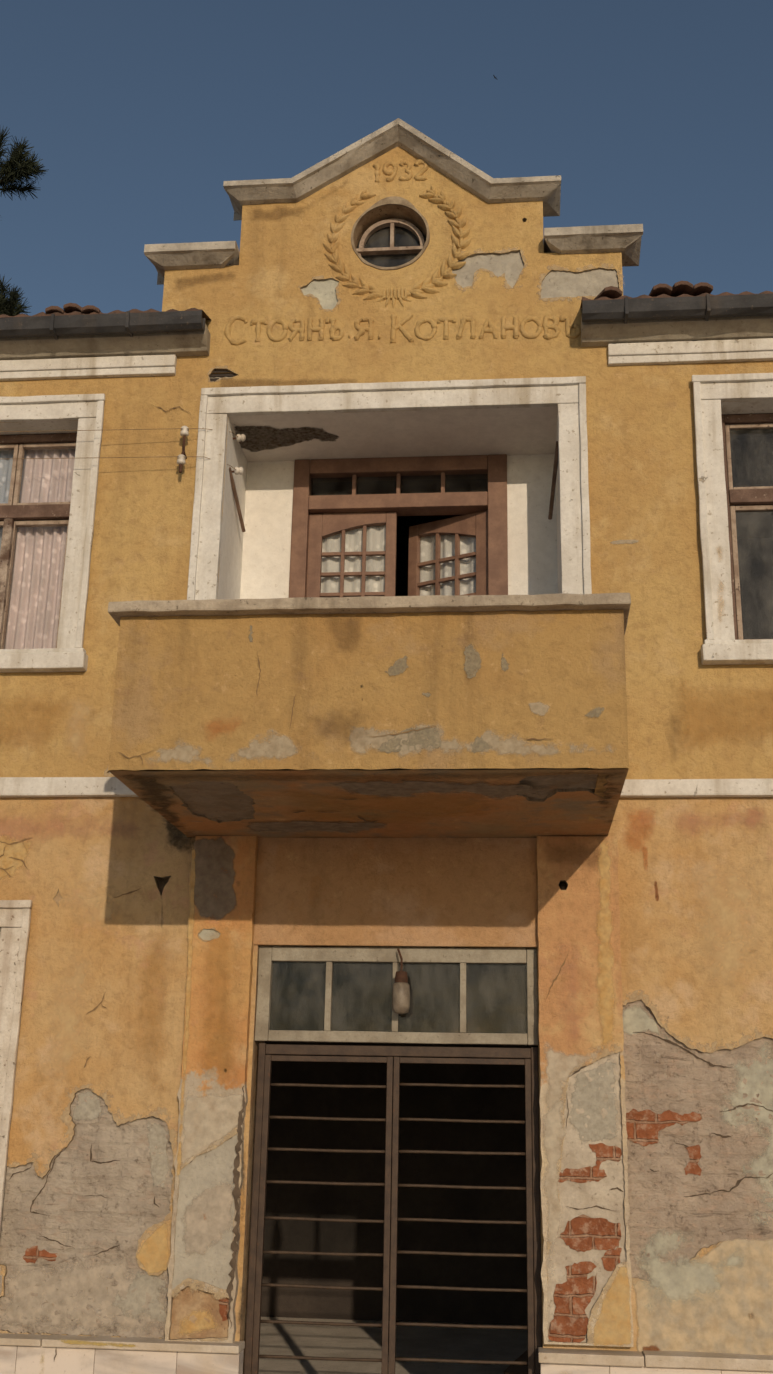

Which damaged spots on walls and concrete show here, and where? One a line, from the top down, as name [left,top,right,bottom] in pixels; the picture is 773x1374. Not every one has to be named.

flaking render [299,275,341,311]
flaking render [452,247,624,302]
spalling [208,366,238,382]
peeling [379,726,441,753]
peeling [193,837,237,942]
flaking render [546,990,773,1343]
flaking render [0,1084,245,1341]